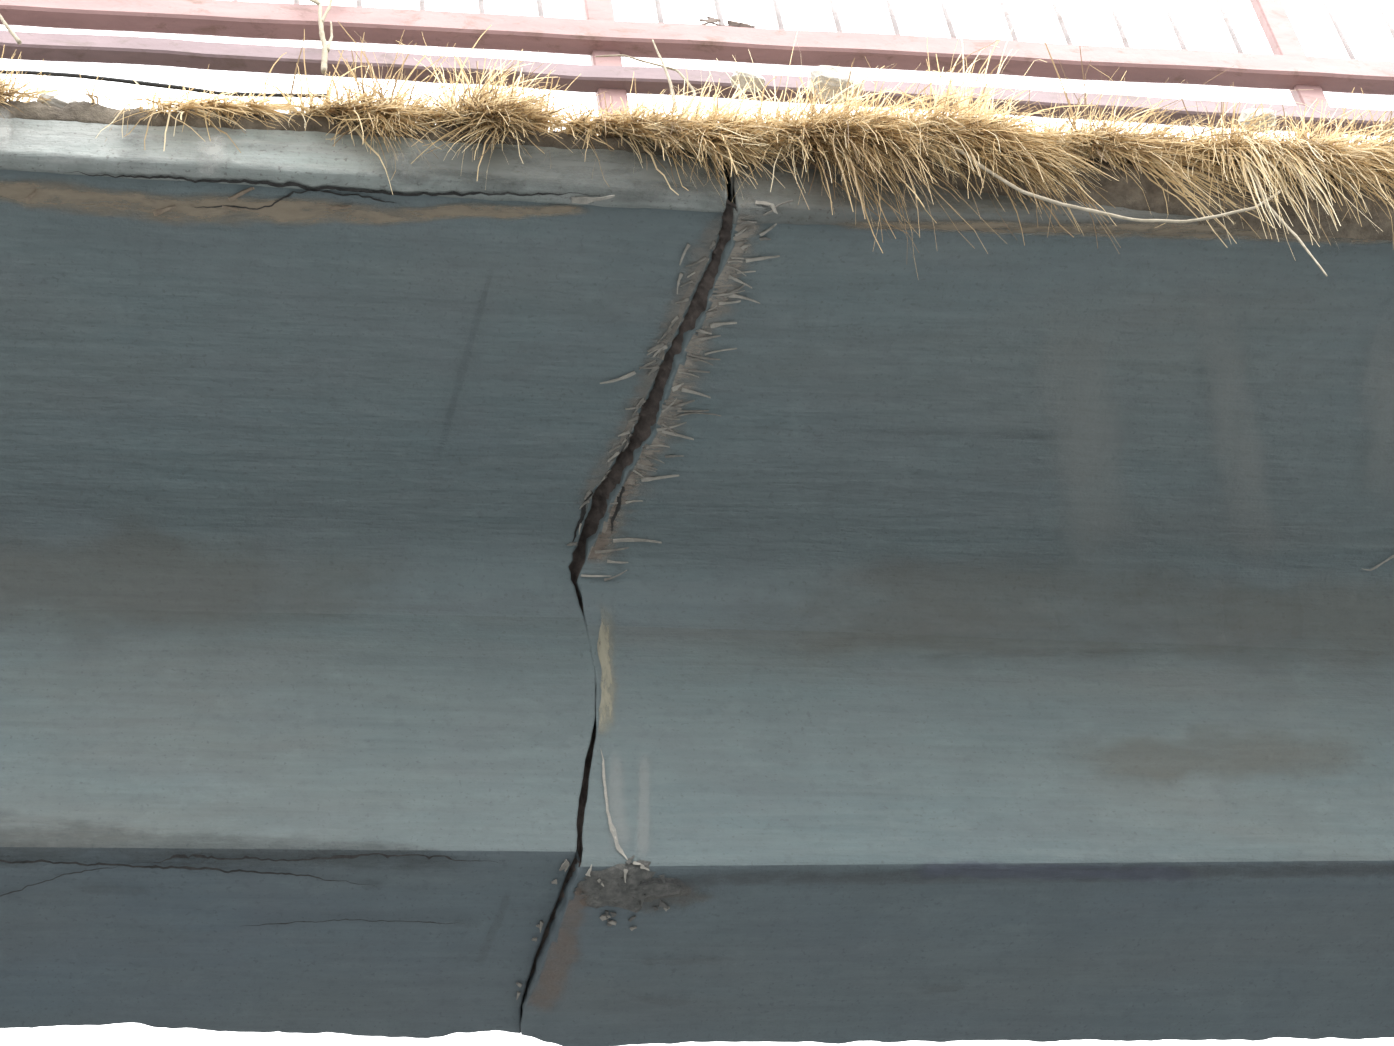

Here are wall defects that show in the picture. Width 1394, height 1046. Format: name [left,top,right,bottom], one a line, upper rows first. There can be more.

crack [516,199,793,1000]
crack [0,853,498,897]
crack [245,918,464,926]
spalling [573,855,691,931]